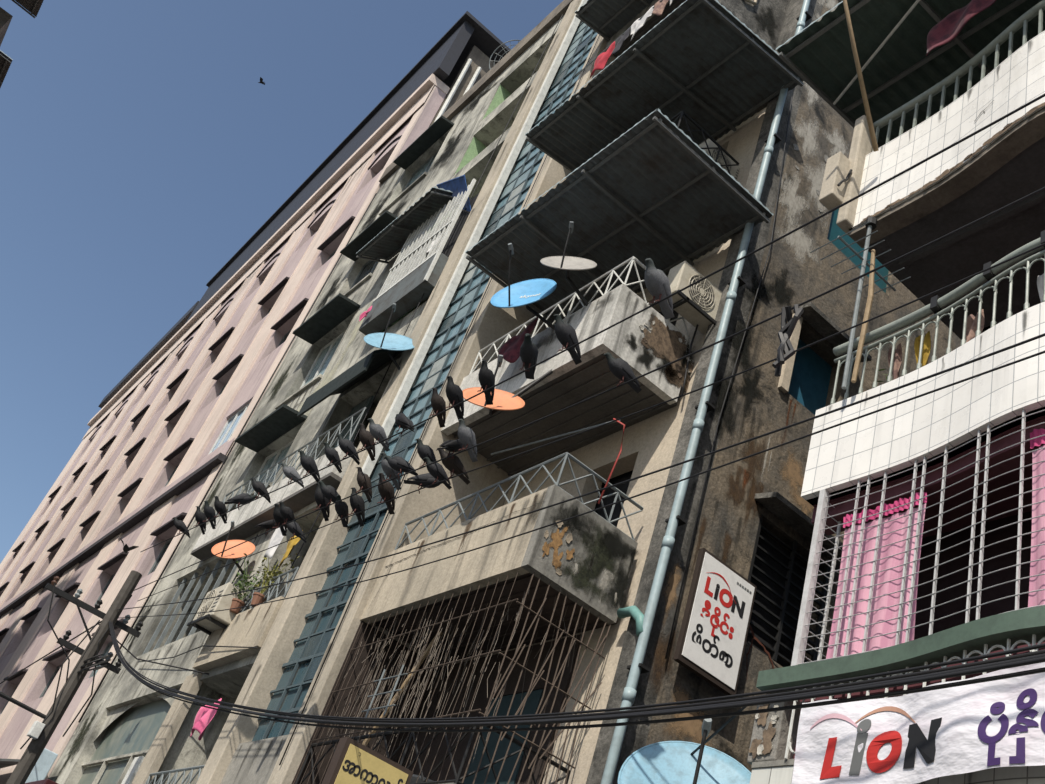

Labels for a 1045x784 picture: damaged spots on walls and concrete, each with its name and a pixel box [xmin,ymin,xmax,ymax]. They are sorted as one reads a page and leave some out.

damp [755,8,778,38]
damp [806,83,818,104]
damp [778,121,846,260]
damp [627,334,693,383]
spalling [542,520,575,575]
damp [553,500,638,609]
peeling [749,693,779,758]